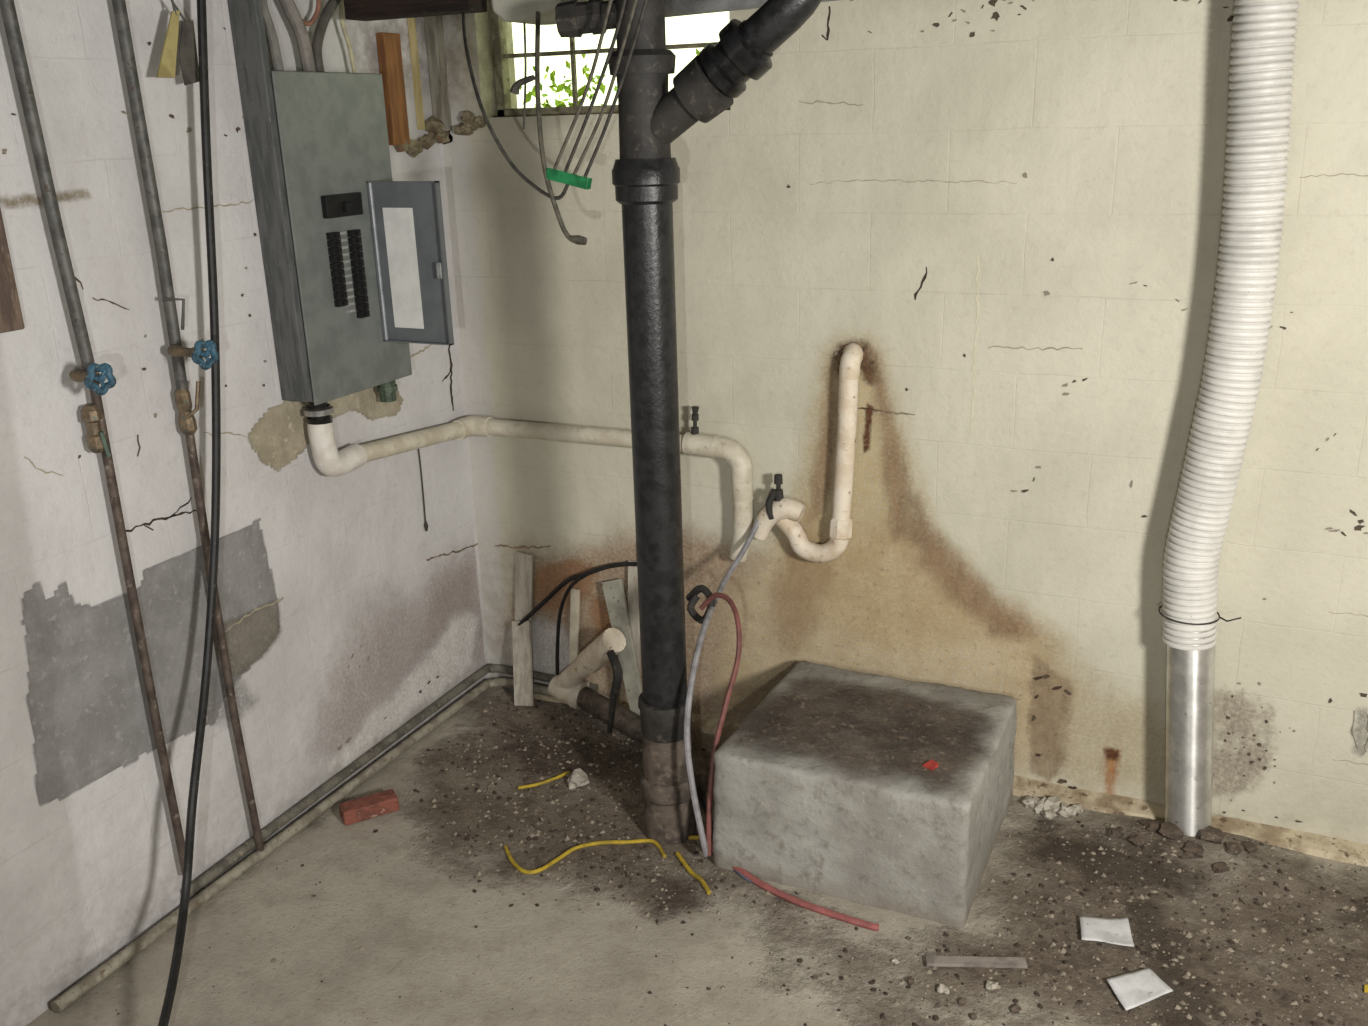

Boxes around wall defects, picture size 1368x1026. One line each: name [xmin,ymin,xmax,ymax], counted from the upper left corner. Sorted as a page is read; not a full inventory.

spalling [204,401,309,471]
spalling [327,386,403,420]
water stain [683,351,1055,765]
peeling [22,519,284,805]
water stain [531,548,637,686]
corrosion [1107,749,1118,794]
water stain [1221,682,1296,784]